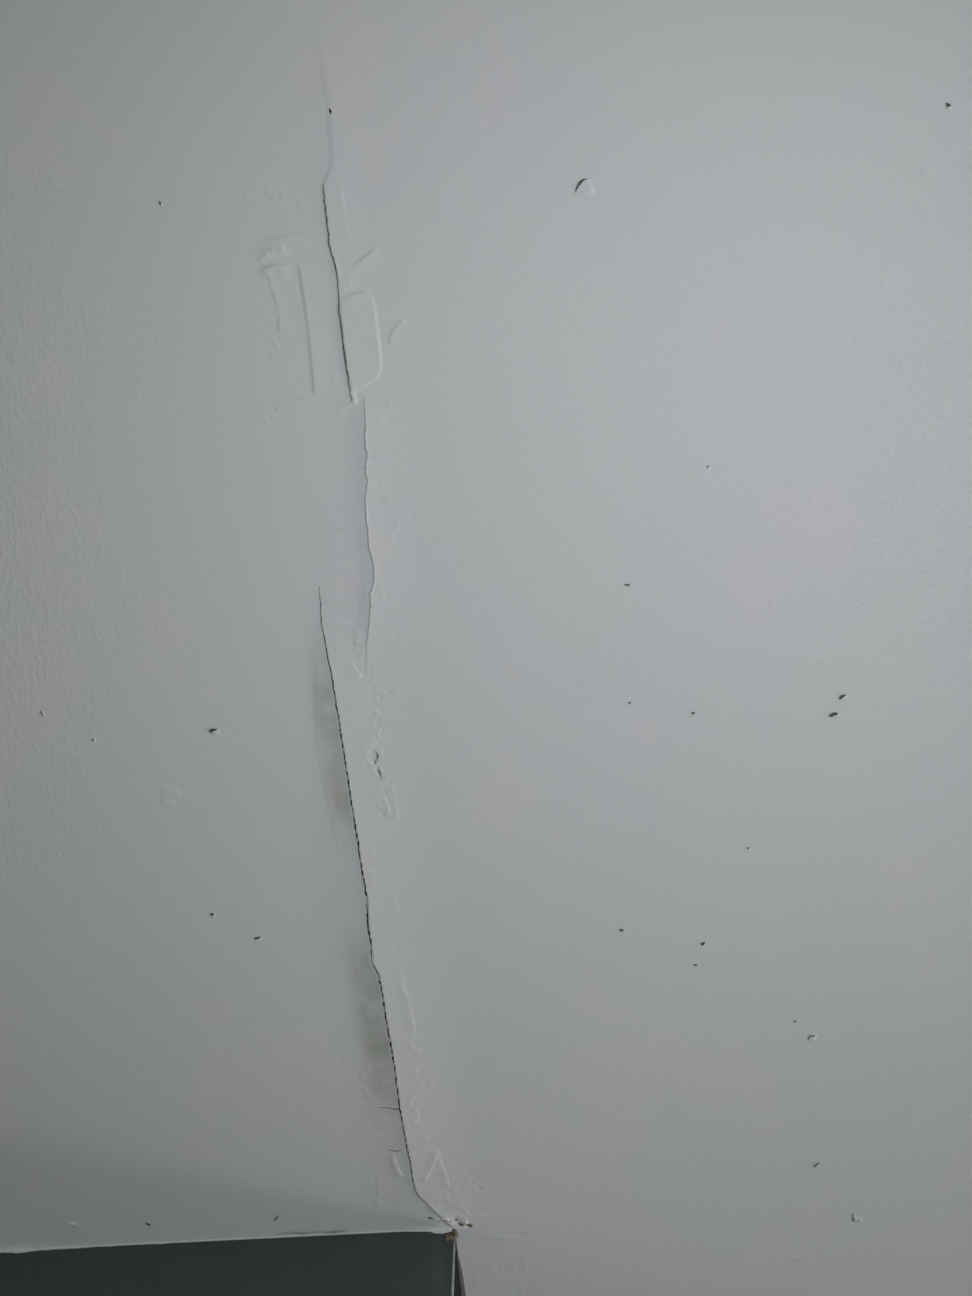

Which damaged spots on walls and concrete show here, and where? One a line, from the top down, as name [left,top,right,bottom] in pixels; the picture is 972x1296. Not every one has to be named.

crack [303,587,499,1230]